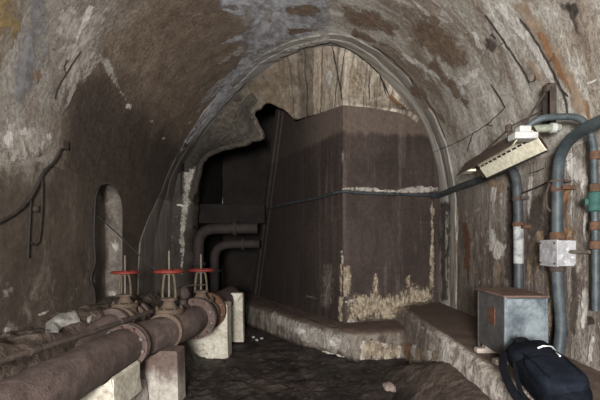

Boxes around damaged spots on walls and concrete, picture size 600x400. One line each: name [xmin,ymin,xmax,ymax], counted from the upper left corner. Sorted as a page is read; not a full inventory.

crack [280,42,389,105]
crack [372,45,505,152]
crack [485,14,536,83]
rust [514,3,590,120]
spalling [177,169,194,274]